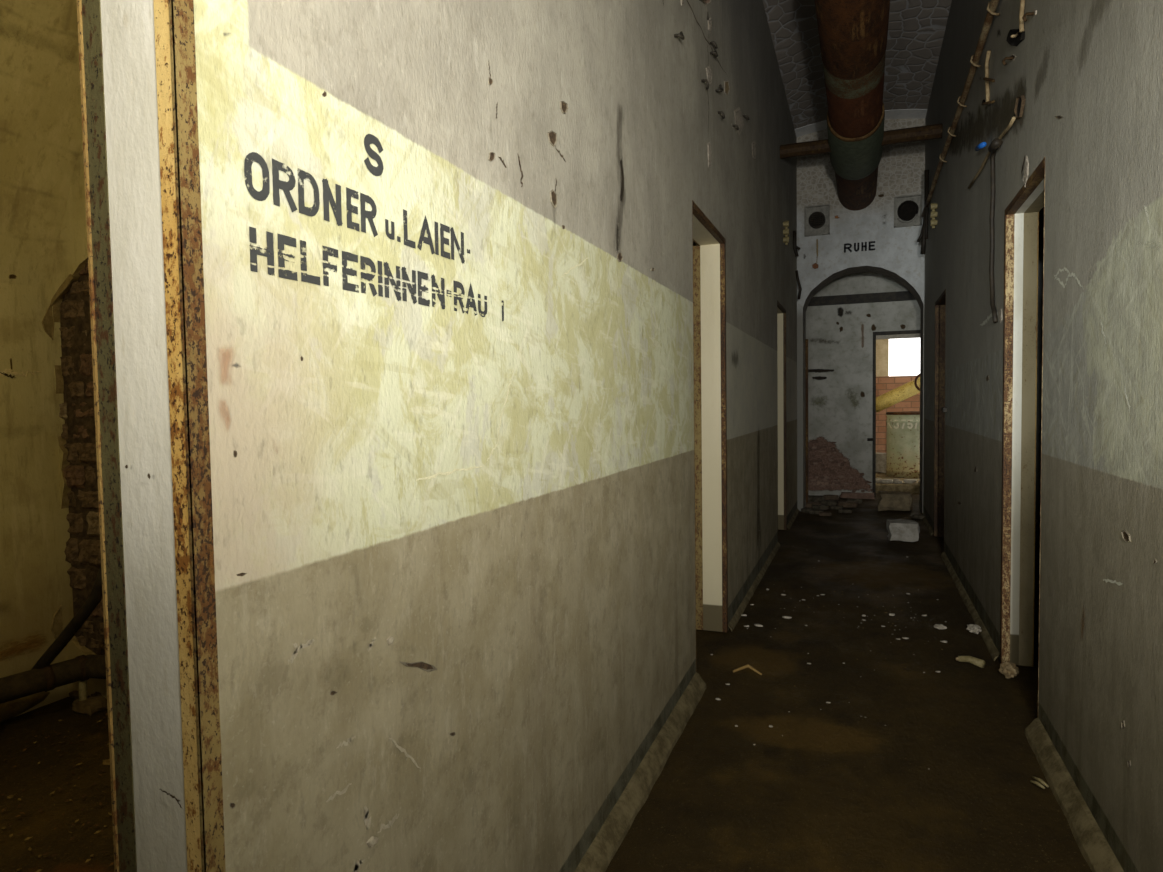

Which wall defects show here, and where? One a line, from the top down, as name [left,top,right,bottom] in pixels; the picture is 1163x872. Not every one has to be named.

rust [815,0,890,138]
flaking render [41,263,105,655]